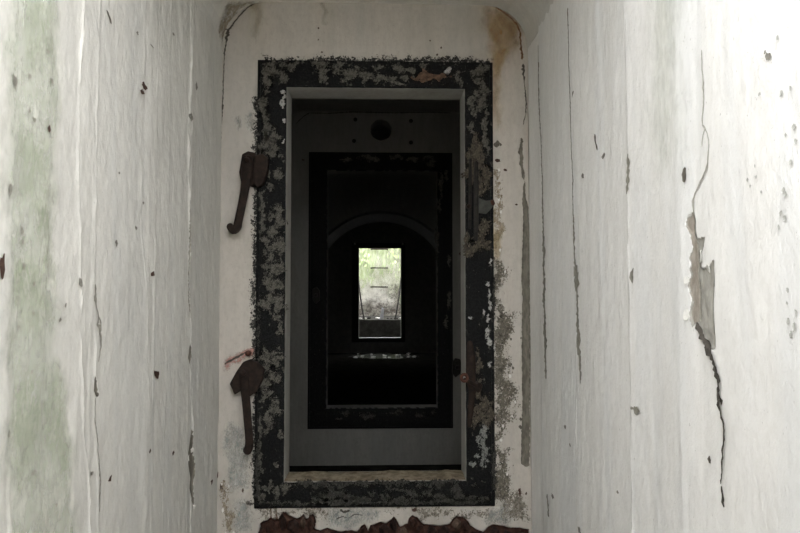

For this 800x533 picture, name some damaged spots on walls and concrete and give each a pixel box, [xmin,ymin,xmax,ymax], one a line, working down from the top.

crack [93,398,101,512]
crack [94,284,102,362]
spalling [246,51,531,533]
crack [495,7,547,379]
crack [567,8,582,383]
spalling [683,212,716,349]
crack [692,50,709,213]
crack [695,322,725,507]